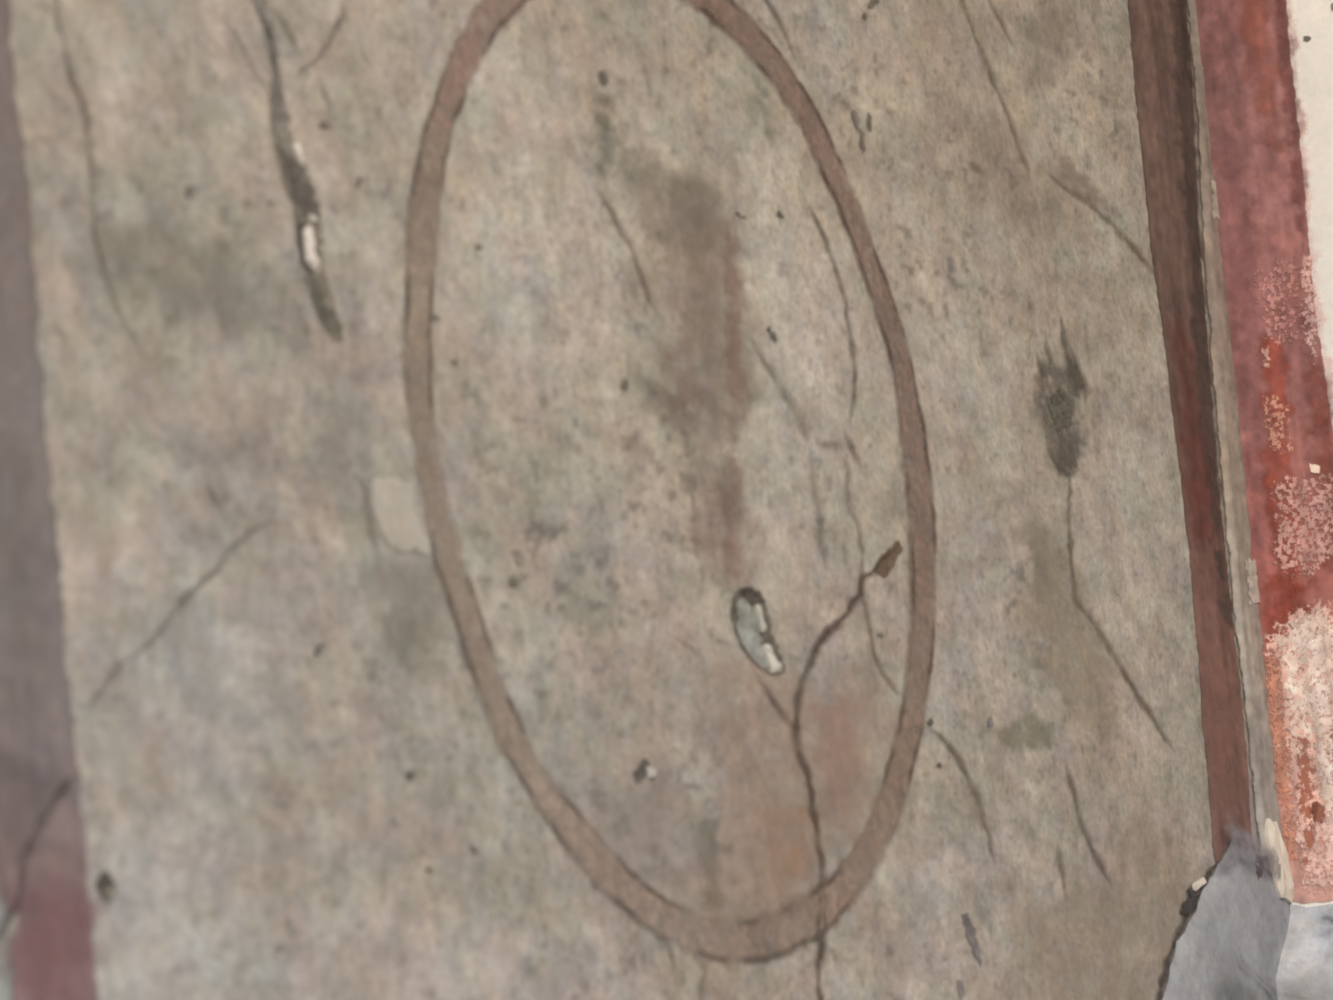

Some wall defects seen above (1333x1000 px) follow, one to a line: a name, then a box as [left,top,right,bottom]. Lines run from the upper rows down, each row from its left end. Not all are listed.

crack [1067,490,1075,574]
crack [151,561,223,641]
flaking render [730,586,786,676]
crack [1083,609,1165,737]
crack [767,552,891,1000]
crack [0,780,70,943]